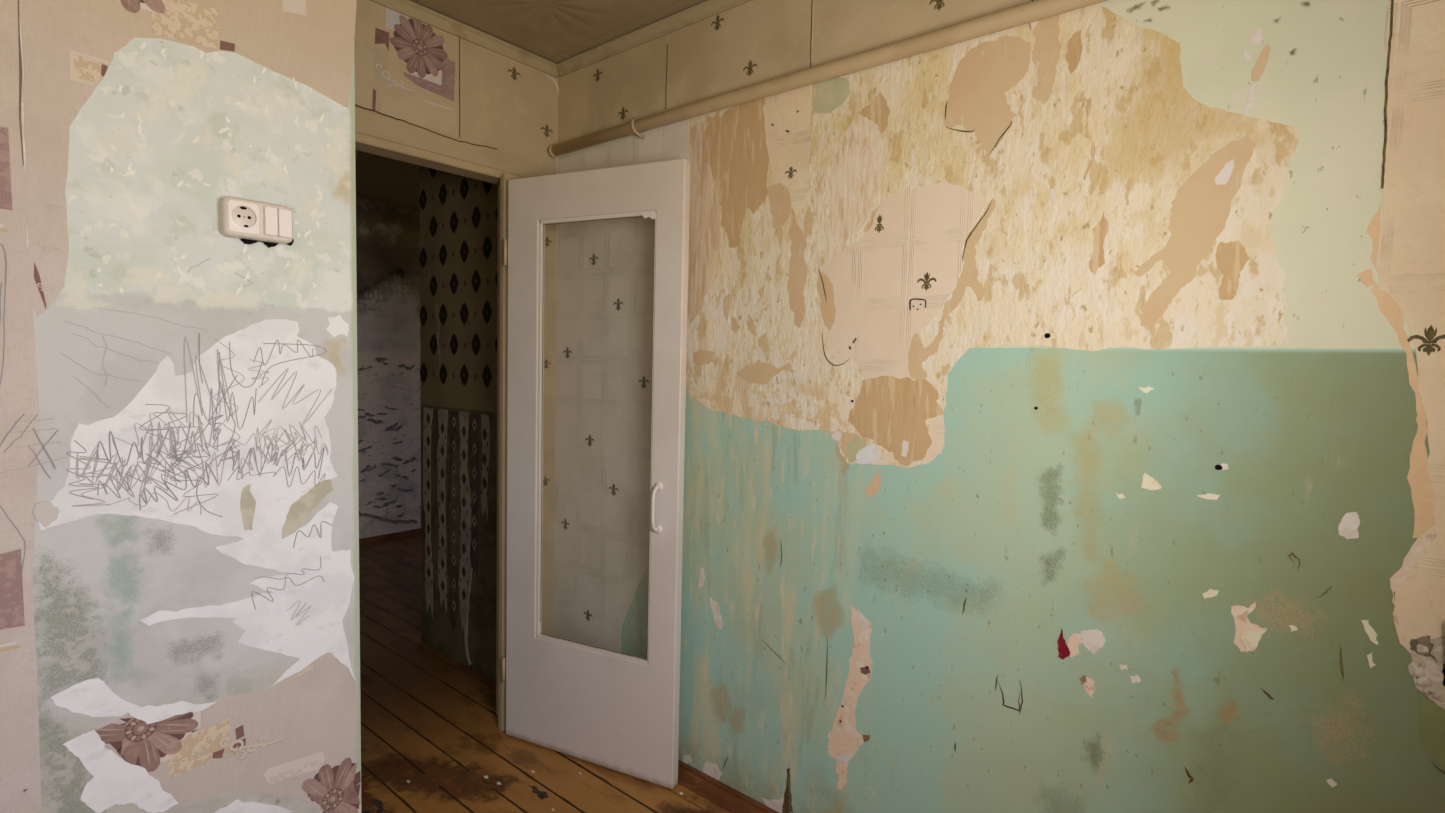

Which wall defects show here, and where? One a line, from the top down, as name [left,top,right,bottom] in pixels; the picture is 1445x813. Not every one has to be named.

peeling [687,122,722,326]
peeling [856,418,945,497]
peeling [240,484,256,530]
peeling [282,479,333,539]
peeling [1338,512,1360,539]
peeling [23,547,179,813]
peeling [126,701,216,724]
peeling [827,605,873,790]
peeling [1057,628,1105,659]
peeling [1231,602,1267,653]
spalling [1390,527,1445,710]
peeling [361,693,586,813]